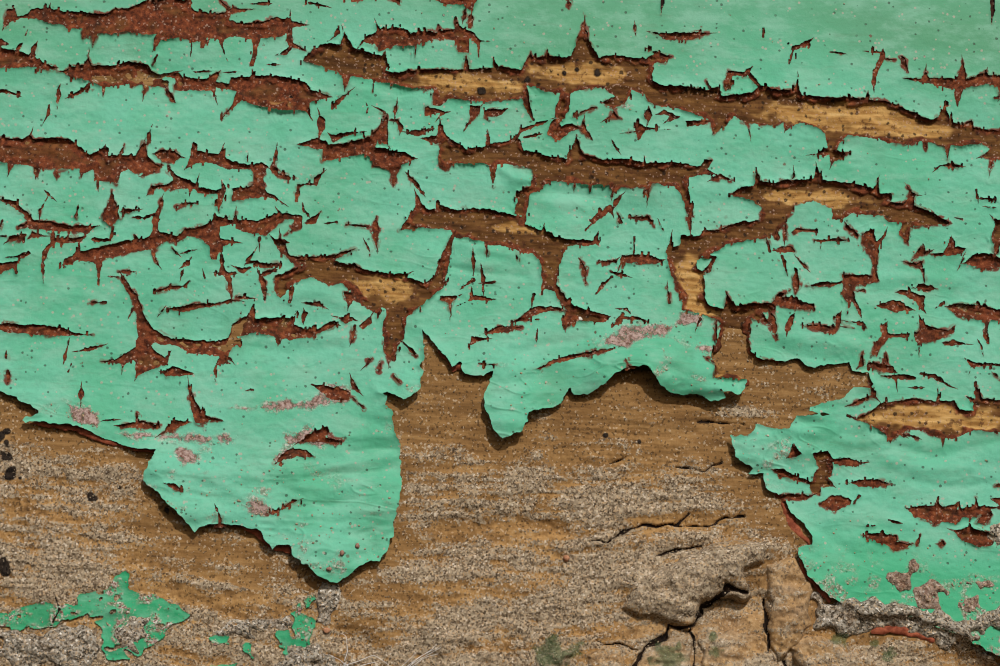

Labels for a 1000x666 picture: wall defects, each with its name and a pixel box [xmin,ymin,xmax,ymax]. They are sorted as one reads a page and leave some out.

peeling [452,328,747,438]
peeling [8,392,402,583]
crack [589,512,745,556]
peeling [730,418,1000,656]
crack [597,583,787,666]